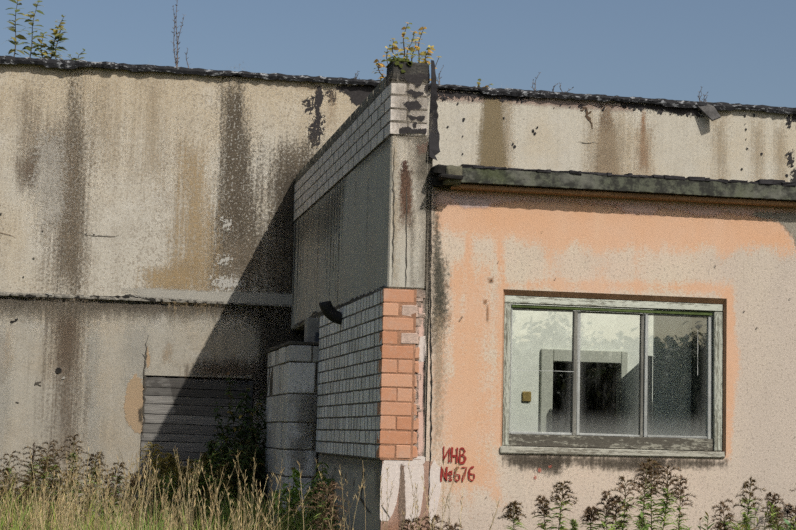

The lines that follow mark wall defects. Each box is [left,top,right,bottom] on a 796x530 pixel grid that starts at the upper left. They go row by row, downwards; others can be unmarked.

crack [0,293,285,307]
water stain [0,69,343,463]
peeling [302,83,377,150]
crack [293,149,407,328]
corrosion [400,160,413,225]
crack [424,177,432,490]
water stain [416,144,450,337]
water stain [478,97,508,168]
peeling [433,190,796,245]
peeling [785,149,796,183]
crack [141,335,149,437]
water stain [386,464,406,530]